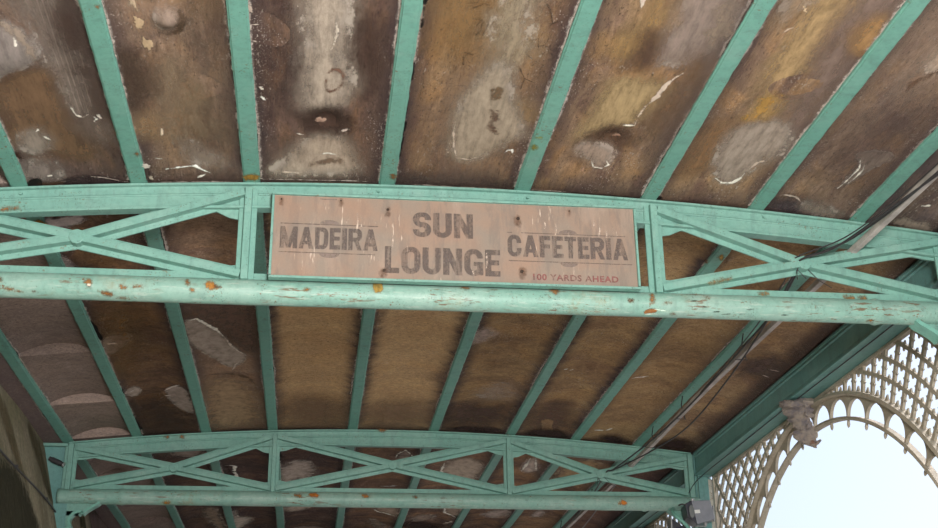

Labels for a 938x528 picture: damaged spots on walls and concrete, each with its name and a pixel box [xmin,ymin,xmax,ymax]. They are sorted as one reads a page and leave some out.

water stain [0,0,125,185]
water stain [121,52,153,108]
water stain [130,0,157,50]
water stain [263,0,379,182]
water stain [441,0,539,162]
water stain [574,0,741,173]
water stain [687,0,901,184]
water stain [906,55,938,91]
water stain [0,396,25,478]
water stain [29,426,51,496]